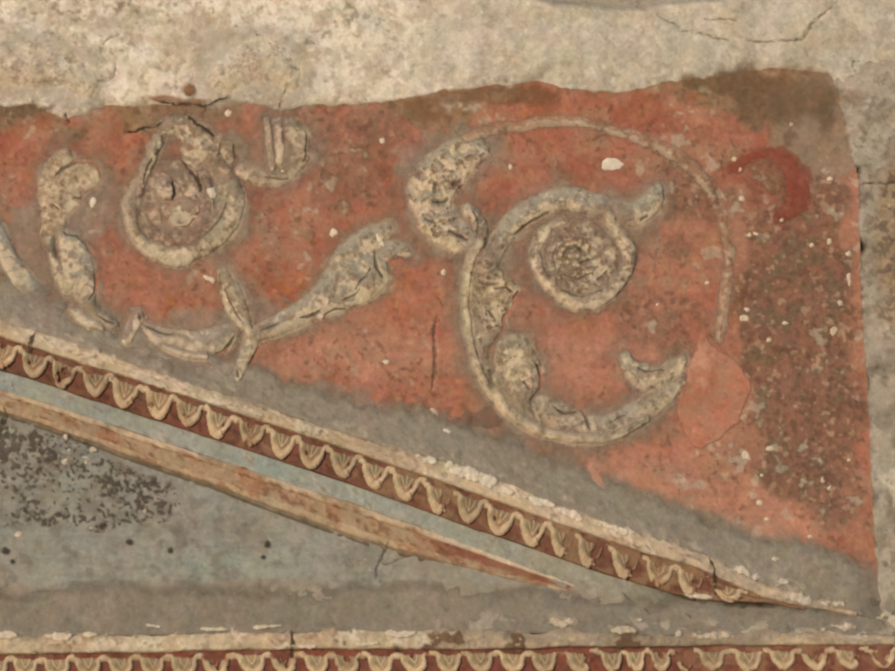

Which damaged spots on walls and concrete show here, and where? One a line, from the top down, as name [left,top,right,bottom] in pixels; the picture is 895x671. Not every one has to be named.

crack [288,630,296,658]